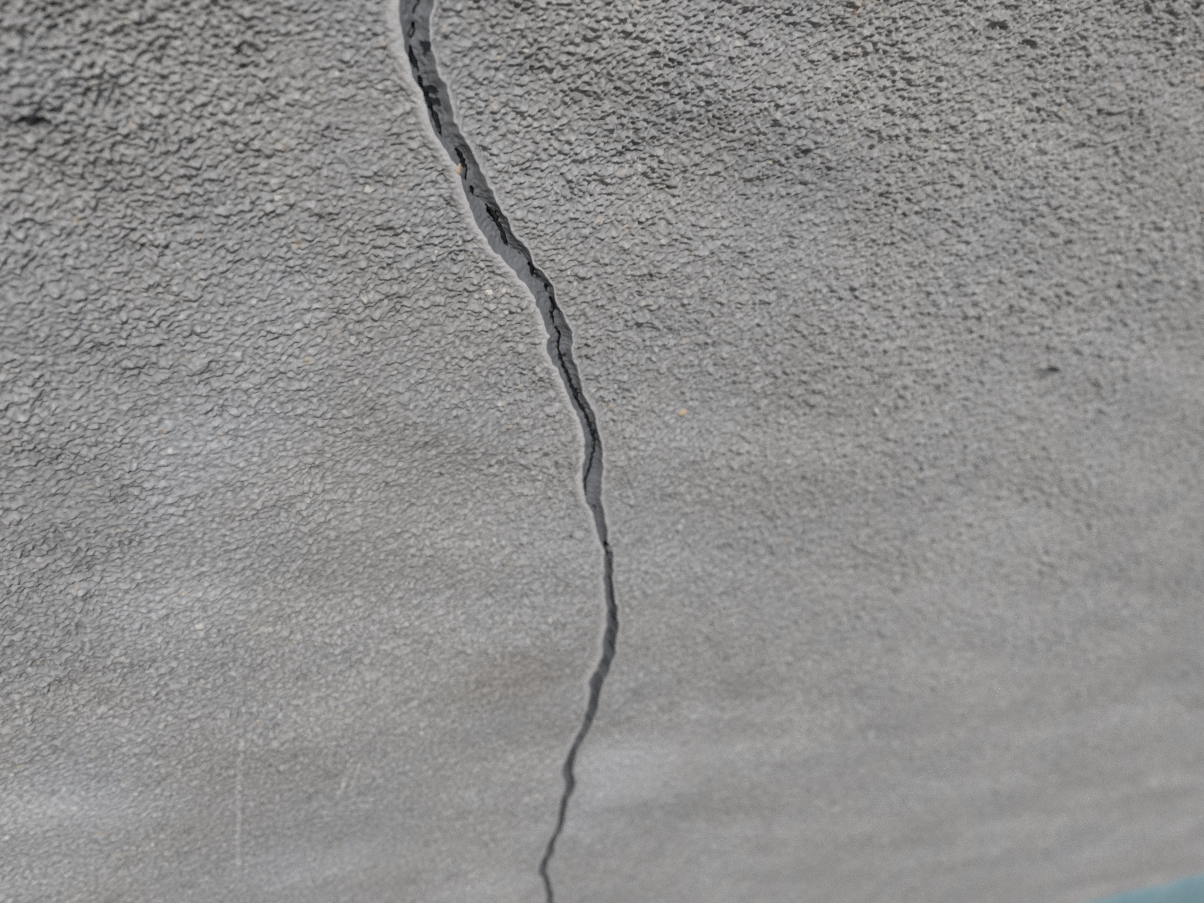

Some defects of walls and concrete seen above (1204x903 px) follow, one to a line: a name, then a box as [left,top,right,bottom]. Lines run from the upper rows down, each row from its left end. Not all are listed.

crack [381,0,624,903]